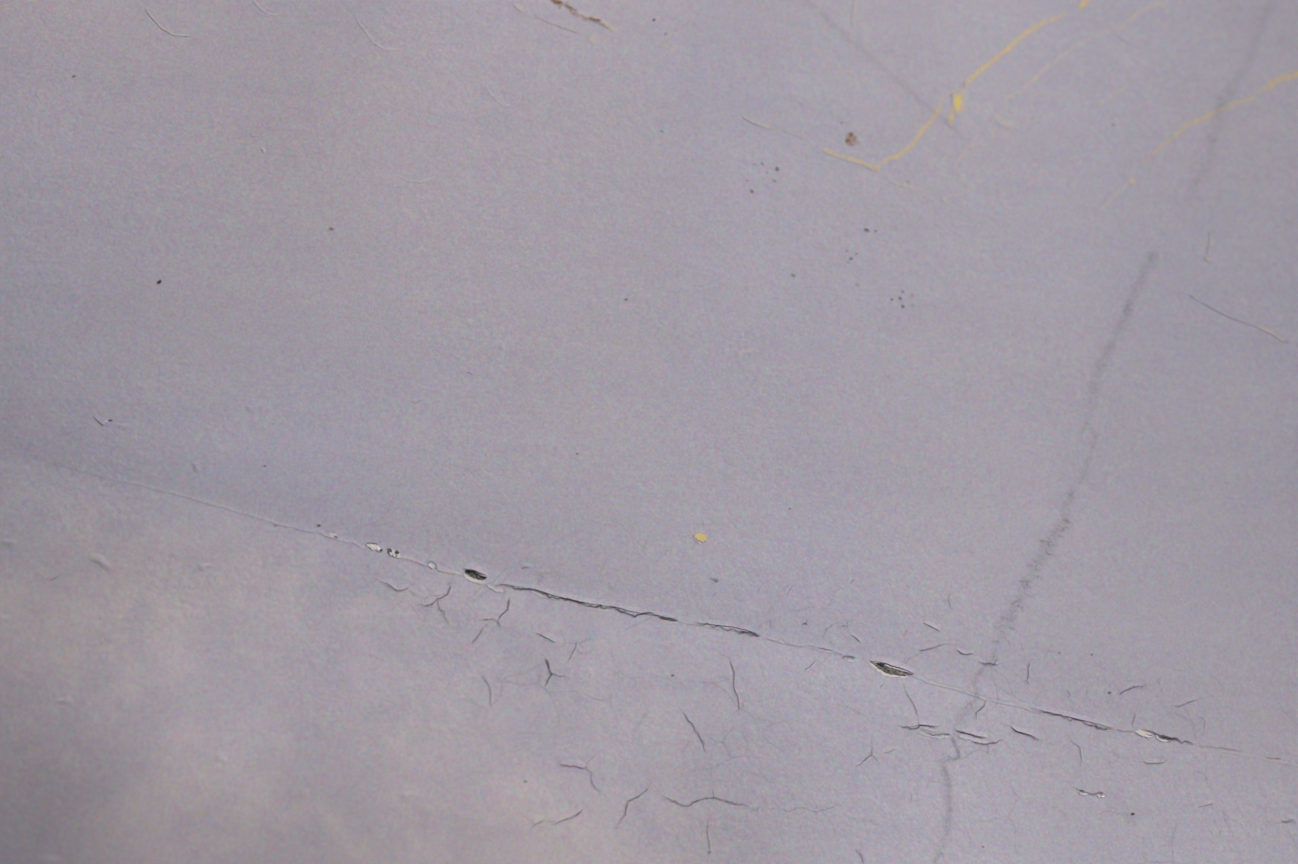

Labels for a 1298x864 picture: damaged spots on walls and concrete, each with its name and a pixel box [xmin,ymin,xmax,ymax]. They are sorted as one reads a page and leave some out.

hole [462,563,488,585]
crack [380,555,861,711]
crack [923,593,974,654]
spalling [868,657,915,679]
crack [904,675,1114,798]
crack [1148,730,1298,767]